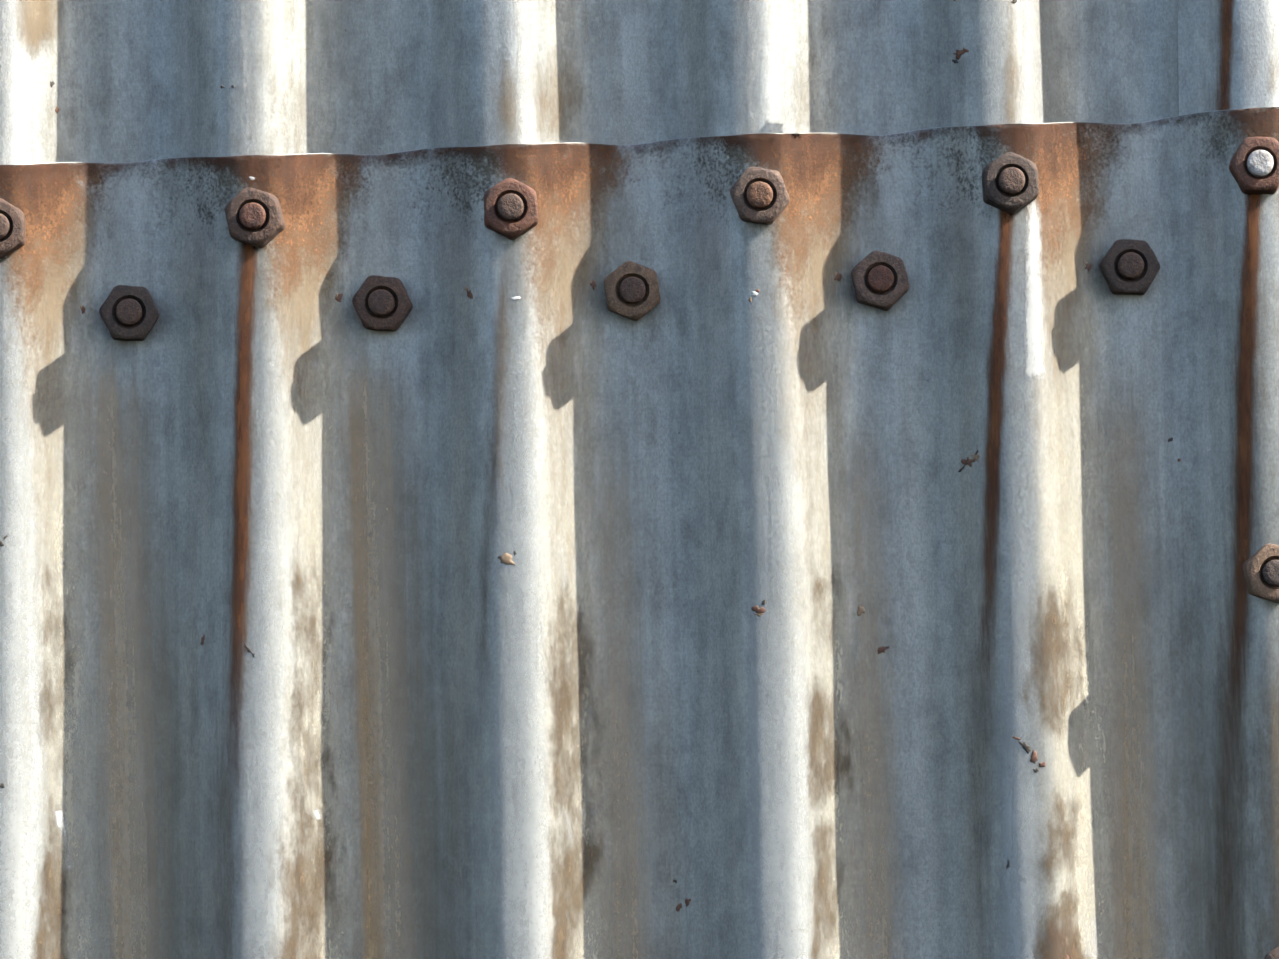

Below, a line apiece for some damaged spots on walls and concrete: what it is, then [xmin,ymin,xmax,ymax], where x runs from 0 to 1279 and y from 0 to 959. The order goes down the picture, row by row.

damp [0,324,98,959]
rust [0,162,133,369]
damp [299,312,351,959]
rust [158,142,656,687]
damp [495,334,548,959]
damp [749,386,809,959]
rust [700,133,883,336]
damp [816,579,862,959]
rust [985,210,1013,589]
damp [1050,262,1108,959]
rust [973,114,1201,308]
rust [1228,194,1261,695]